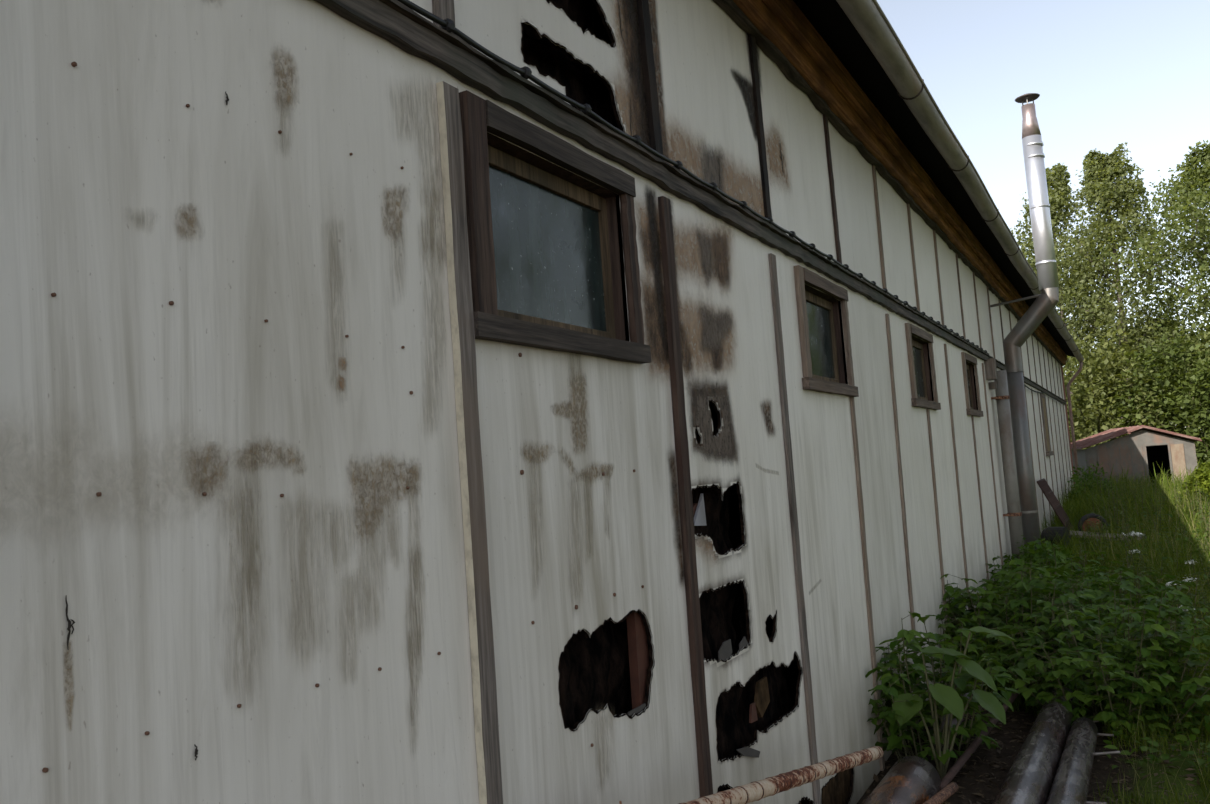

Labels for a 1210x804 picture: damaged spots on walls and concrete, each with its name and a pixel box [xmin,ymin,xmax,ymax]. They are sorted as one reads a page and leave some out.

damp [352,460,418,533]
peeling [718,636,748,661]